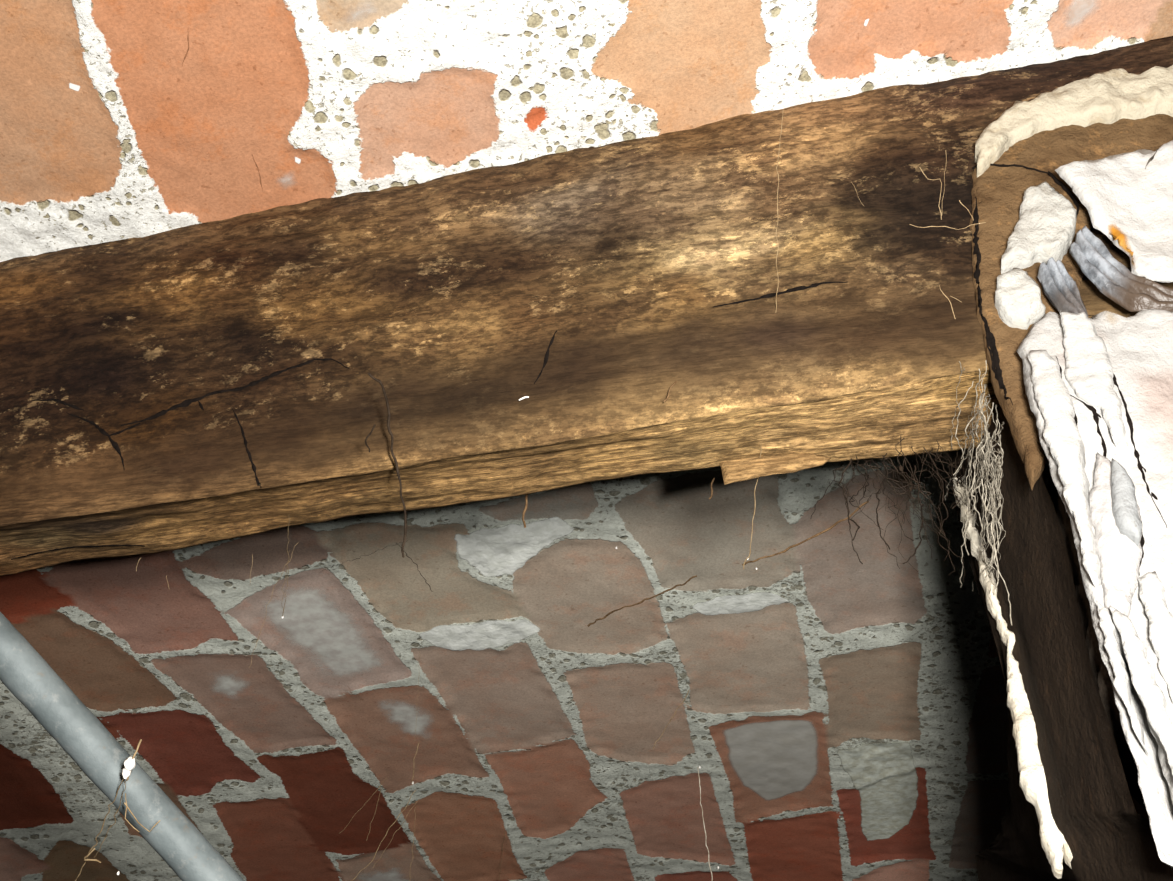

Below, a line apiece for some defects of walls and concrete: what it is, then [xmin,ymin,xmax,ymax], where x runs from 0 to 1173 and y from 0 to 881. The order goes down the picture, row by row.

crack [972,164,1080,405]
crack [33,358,349,488]
crack [1056,357,1167,576]
leakage [268,590,379,674]